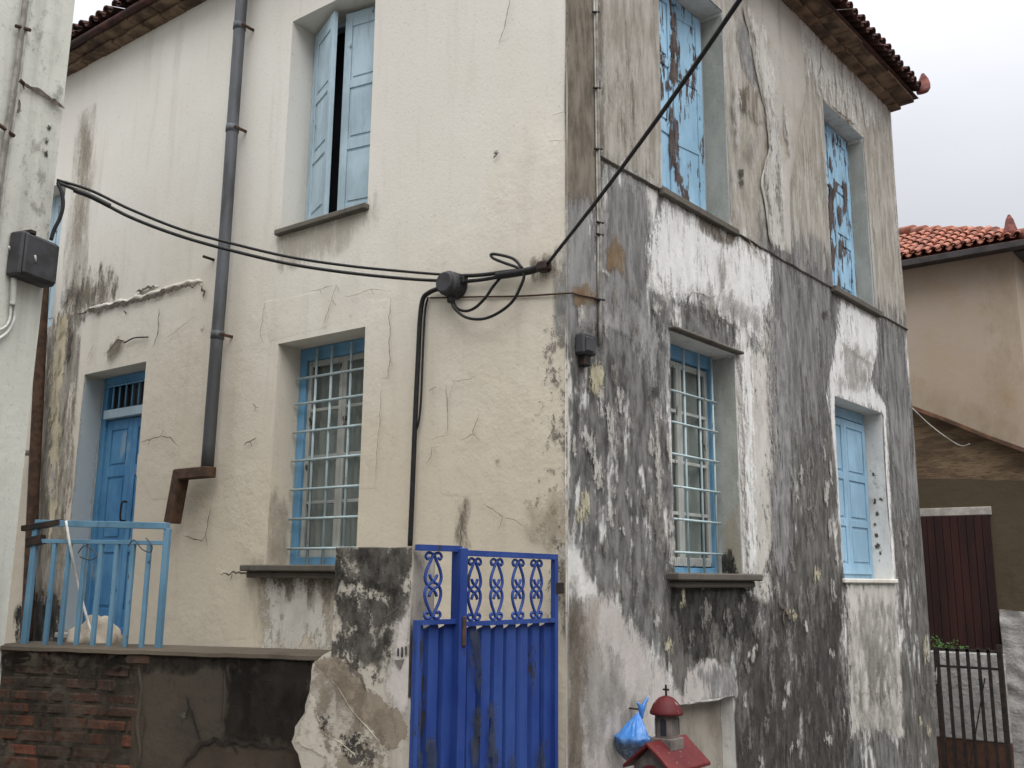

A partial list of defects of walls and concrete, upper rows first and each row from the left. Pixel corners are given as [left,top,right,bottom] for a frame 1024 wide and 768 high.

peeling [666,10,680,91]
peeling [669,116,683,183]
peeling [829,157,848,271]
crack [312,285,393,483]
crack [426,376,480,464]
water stain [535,0,939,768]
water stain [0,264,312,746]
water stain [258,547,412,683]
spalling [293,655,408,768]